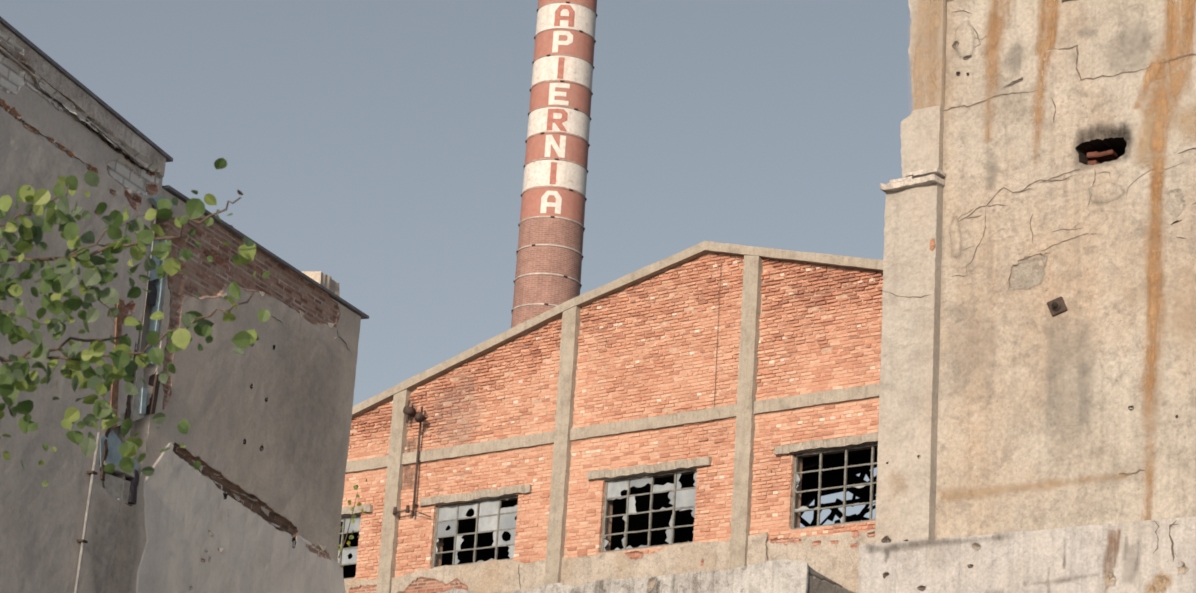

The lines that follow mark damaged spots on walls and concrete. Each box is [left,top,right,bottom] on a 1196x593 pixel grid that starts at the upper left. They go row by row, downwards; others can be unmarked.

flaking render [0,30,160,213]
corrosion [987,2,1004,84]
crack [944,78,1056,123]
corrosion [1035,0,1057,137]
crack [952,144,1196,290]
spalling [1075,137,1127,165]
crack [1047,45,1196,81]
corrosion [1134,0,1194,416]
flaking render [154,217,340,410]
peeling [136,443,377,593]
flaking render [397,576,472,593]
crack [1151,520,1178,561]